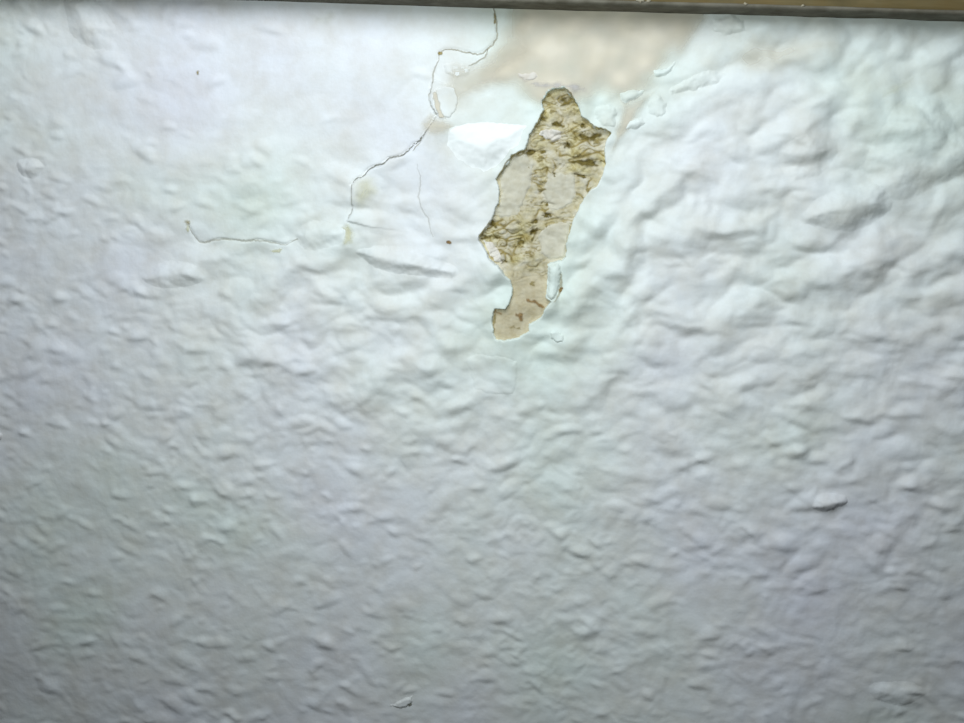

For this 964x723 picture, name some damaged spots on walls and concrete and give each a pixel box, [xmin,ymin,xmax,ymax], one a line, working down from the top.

crack [438,8,498,66]
damp [712,14,746,36]
damp [483,9,726,135]
crack [353,115,437,182]
flaking render [478,88,611,340]